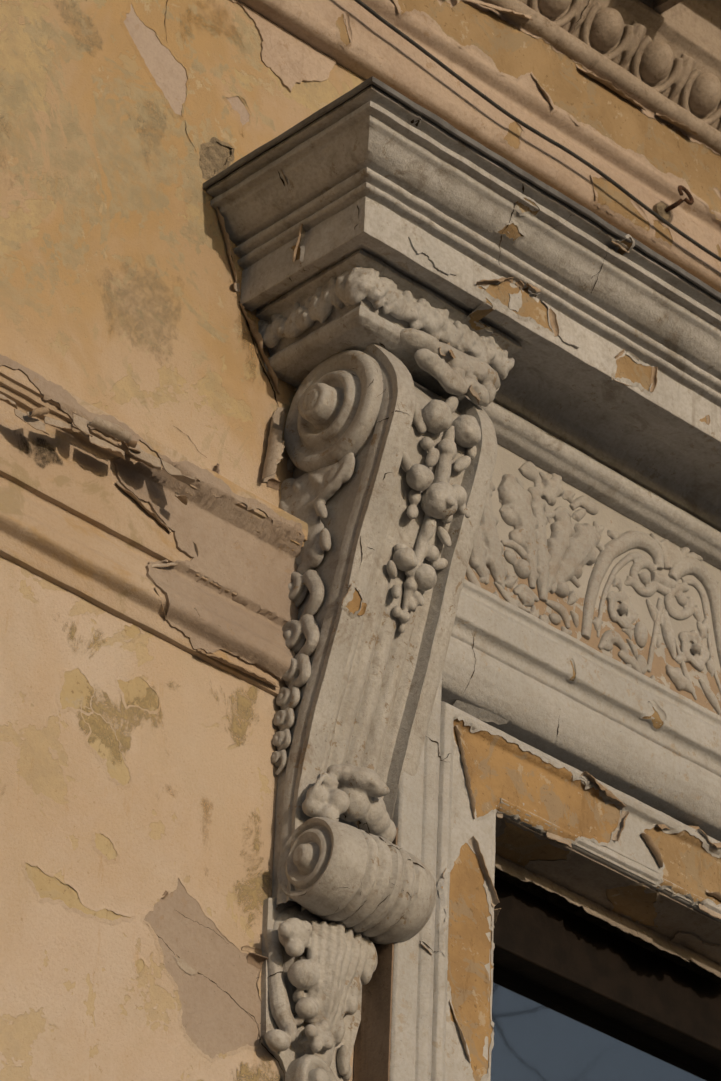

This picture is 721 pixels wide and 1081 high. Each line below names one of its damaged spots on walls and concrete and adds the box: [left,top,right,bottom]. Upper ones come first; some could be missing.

peeling [119,1,190,122]
peeling [392,0,721,226]
peeling [408,236,462,276]
peeling [465,276,559,337]
peeling [590,175,674,258]
peeling [611,349,658,396]
peeling [0,354,305,688]
peeling [56,664,133,790]
peeling [114,673,162,716]
peeling [437,700,721,1081]
peeling [21,859,268,1063]